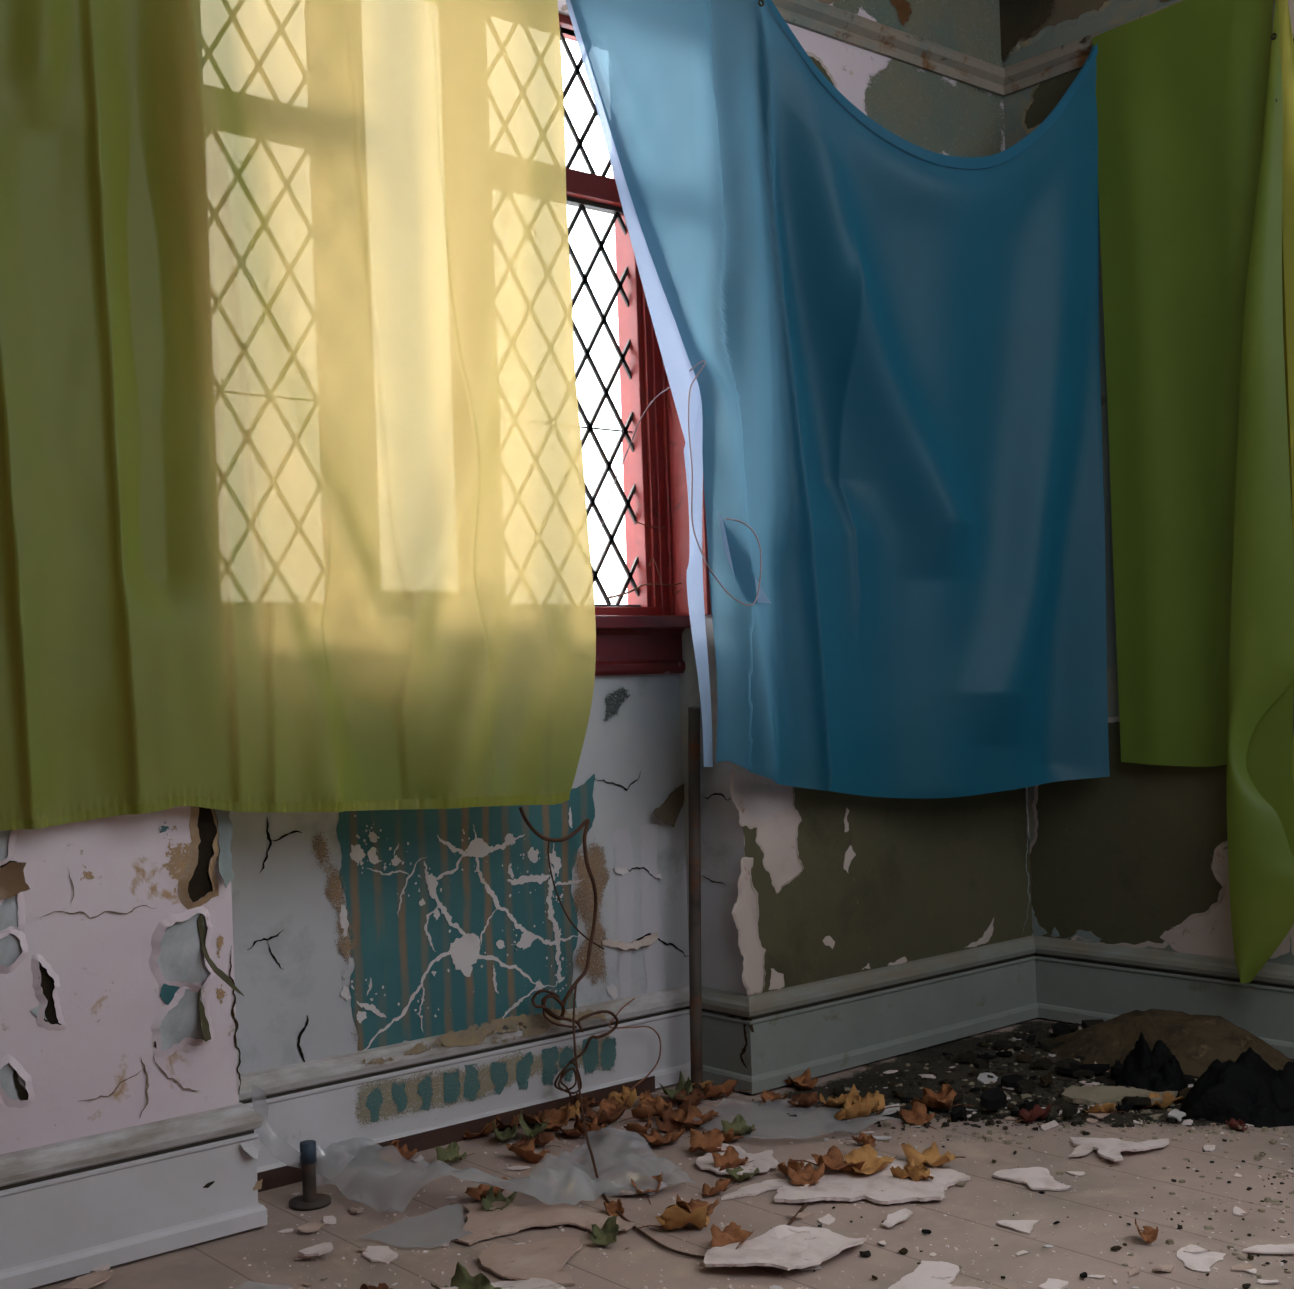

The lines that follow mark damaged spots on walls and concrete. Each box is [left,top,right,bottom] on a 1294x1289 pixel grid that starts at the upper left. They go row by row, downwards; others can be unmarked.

peeling [1001,0,1133,58]
peeling [0,1054,35,1108]
peeling [0,829,67,1031]
crack [42,867,154,919]
crack [82,1051,197,1119]
peeling [149,806,244,1057]
crack [229,930,284,1090]
spalling [743,716,1228,994]